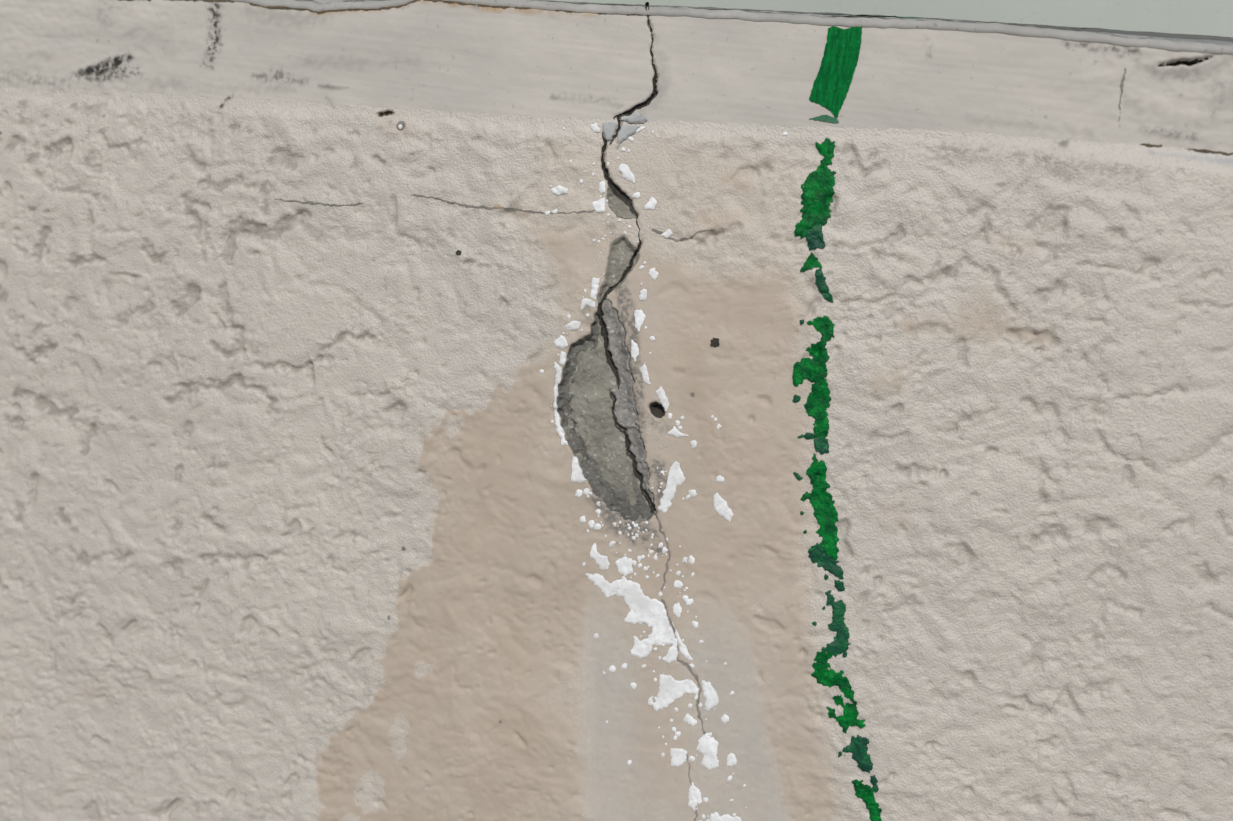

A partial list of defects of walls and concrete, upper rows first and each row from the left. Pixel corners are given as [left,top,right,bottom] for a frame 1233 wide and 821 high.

crack [193,0,715,821]
leakage [314,204,835,821]
spalling [540,112,746,787]
peeling [688,782,747,821]